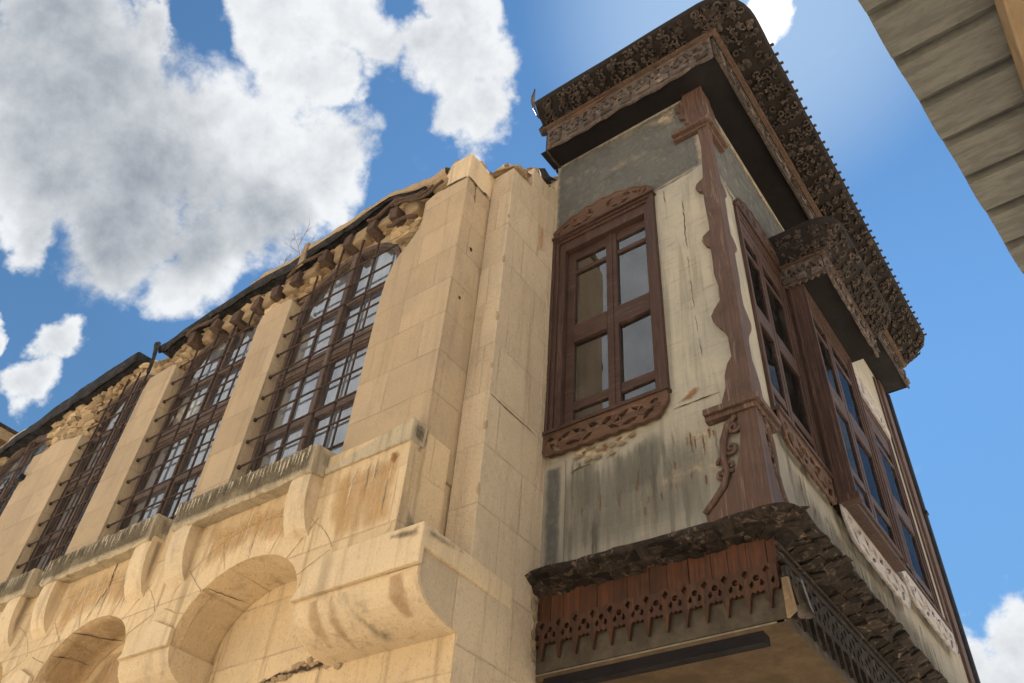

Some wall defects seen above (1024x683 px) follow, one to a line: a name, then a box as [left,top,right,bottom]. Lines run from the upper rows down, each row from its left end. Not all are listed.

crack [655,168,702,353]
peeling [574,432,635,462]
damp [545,469,559,566]
crack [53,563,120,665]
spalling [258,656,342,683]